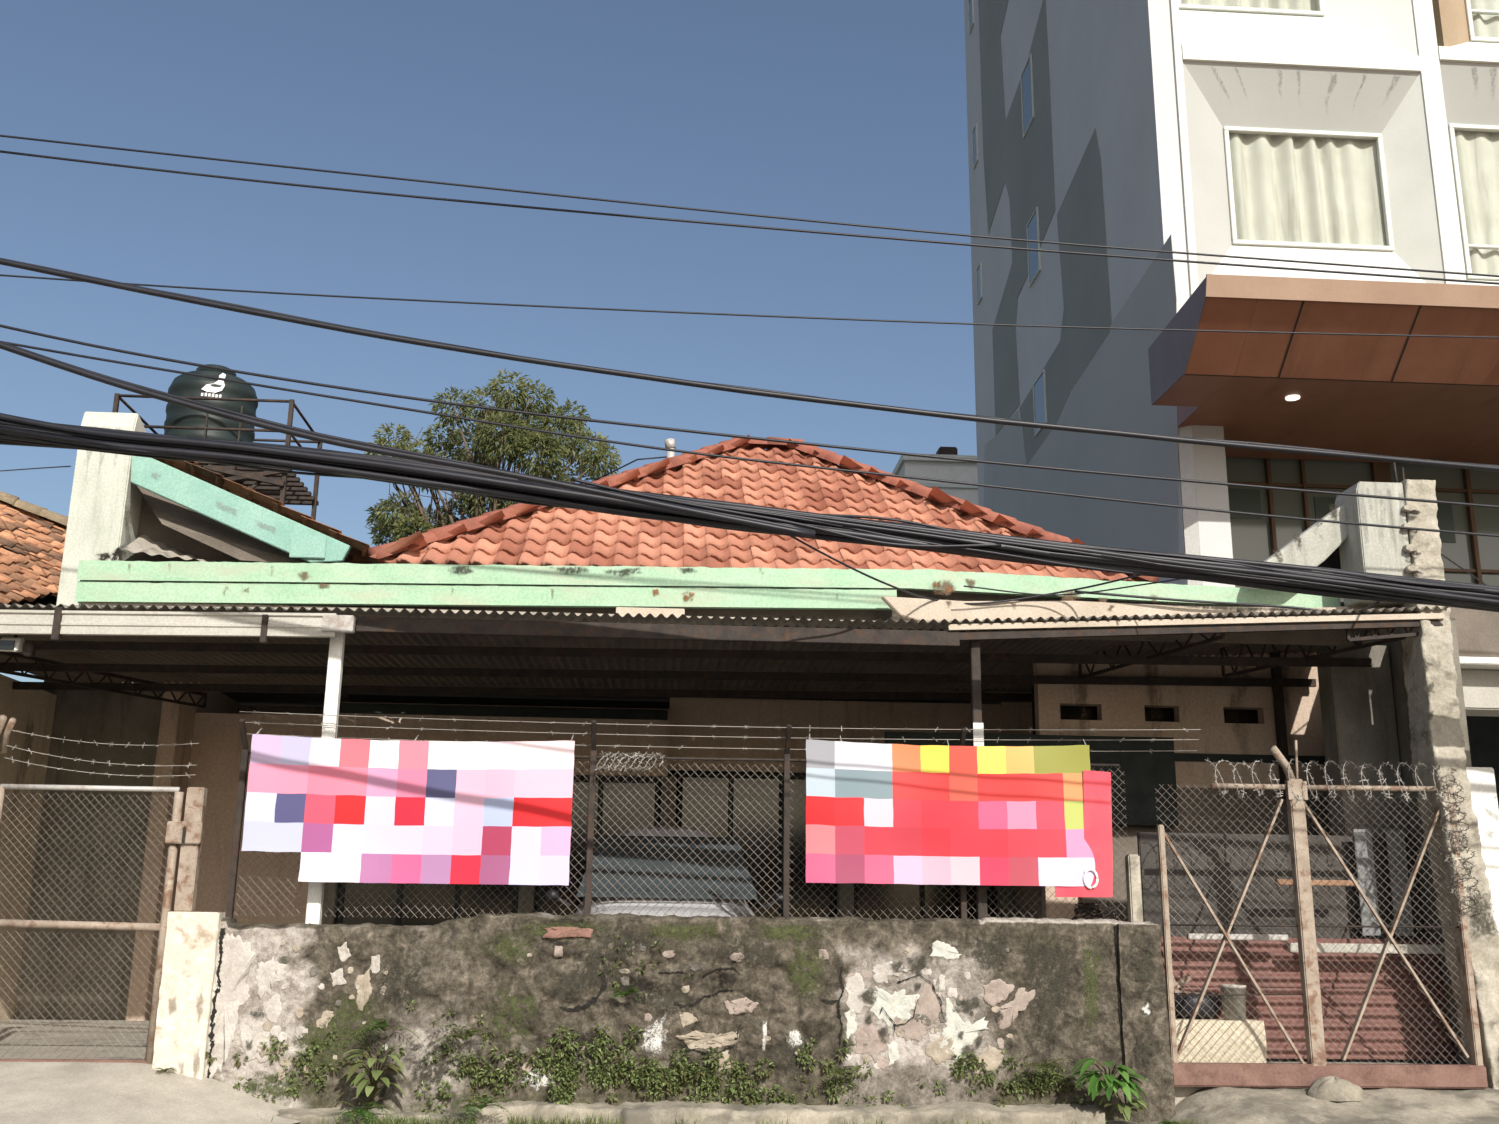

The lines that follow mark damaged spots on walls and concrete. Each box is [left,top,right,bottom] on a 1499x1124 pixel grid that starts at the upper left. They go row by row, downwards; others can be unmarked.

spalling [204,933,388,1081]
spalling [504,1045,552,1090]
spalling [543,918,759,1072]
leakage [788,1030,802,1046]
peeling [844,940,1035,1075]